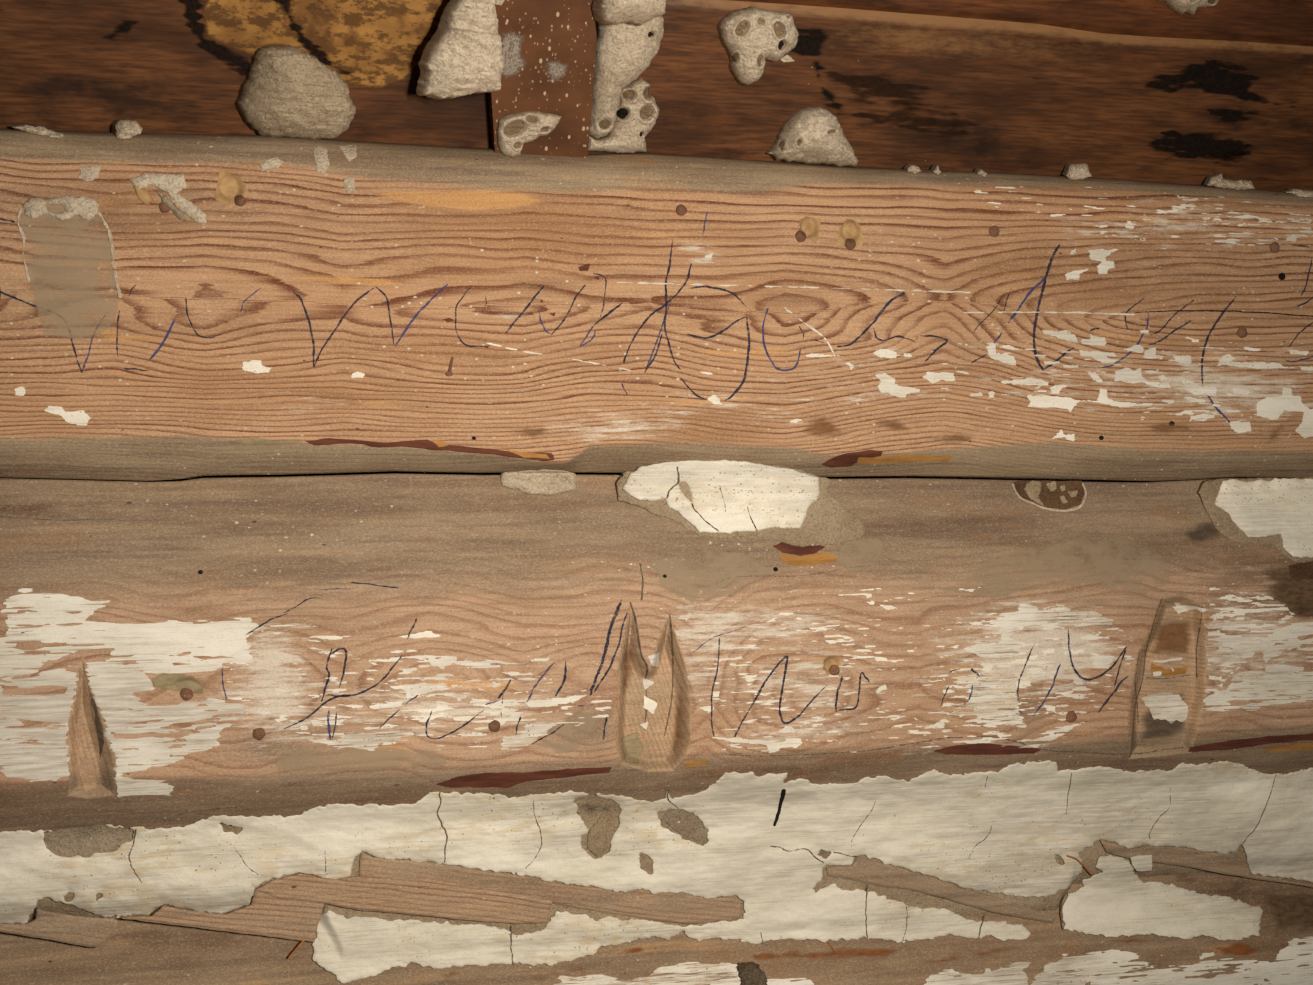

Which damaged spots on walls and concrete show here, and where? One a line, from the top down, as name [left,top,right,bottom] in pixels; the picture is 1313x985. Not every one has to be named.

peeling [974,187,1313,280]
peeling [870,349,969,398]
peeling [969,330,1313,438]
peeling [0,588,612,798]
peeling [640,652,659,730]
peeling [699,588,1135,753]
peeling [1141,588,1313,723]
flaking render [44,824,133,857]
flaking render [574,795,621,859]
flaking render [657,809,708,846]
peeling [554,962,741,985]
peeling [924,937,1313,985]